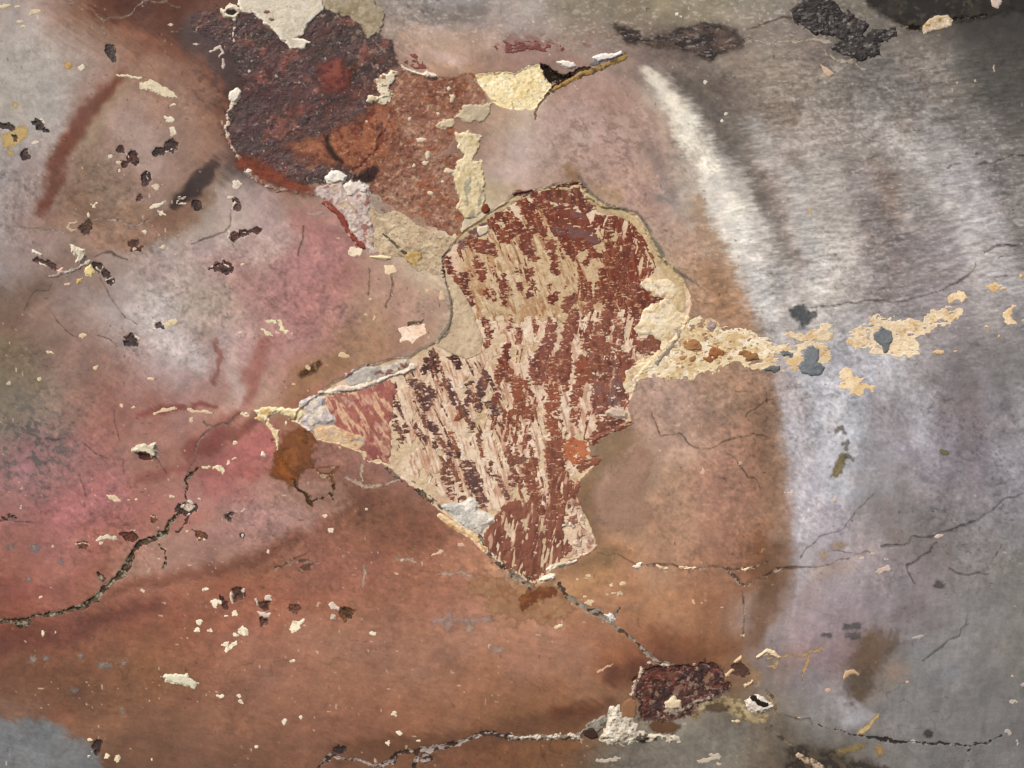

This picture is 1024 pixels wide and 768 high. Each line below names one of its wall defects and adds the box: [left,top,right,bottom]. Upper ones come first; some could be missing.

peeling [191,0,833,587]
peeling [846,291,968,358]
peeling [839,367,875,396]
corrosion [270,428,317,487]
crack [0,413,240,629]
crack [557,581,674,667]
crack [759,646,1008,761]
crack [317,730,513,768]